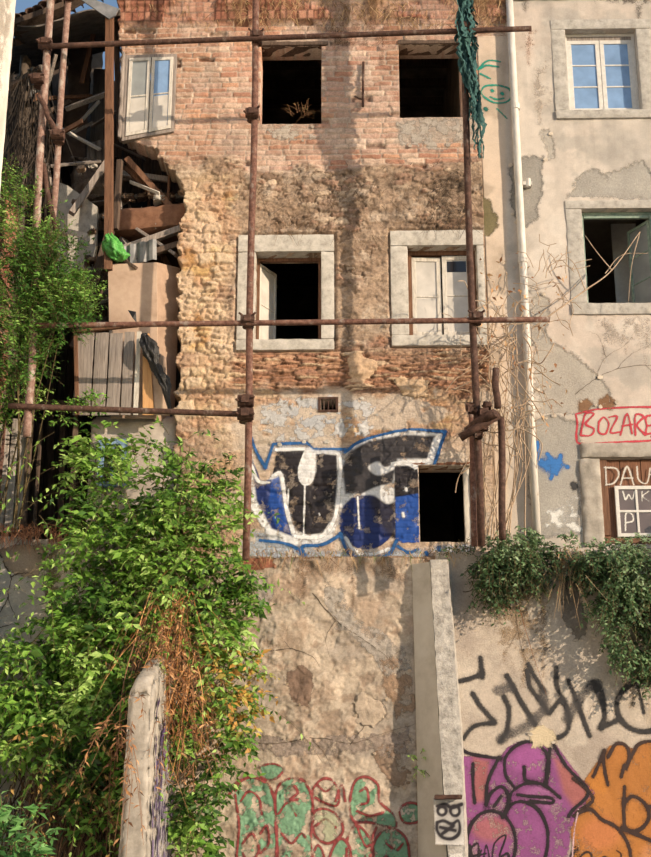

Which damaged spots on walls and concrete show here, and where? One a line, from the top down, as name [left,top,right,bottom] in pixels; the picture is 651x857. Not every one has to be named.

peeling [508,129,555,228]
peeling [567,160,651,200]
spalling [483,198,499,236]
crack [576,331,650,394]
flaking render [260,394,378,452]
peeling [528,292,619,539]
crack [0,554,35,628]
crack [269,593,410,685]
peeling [324,585,416,719]
spalling [285,665,314,708]
peeling [250,726,415,789]